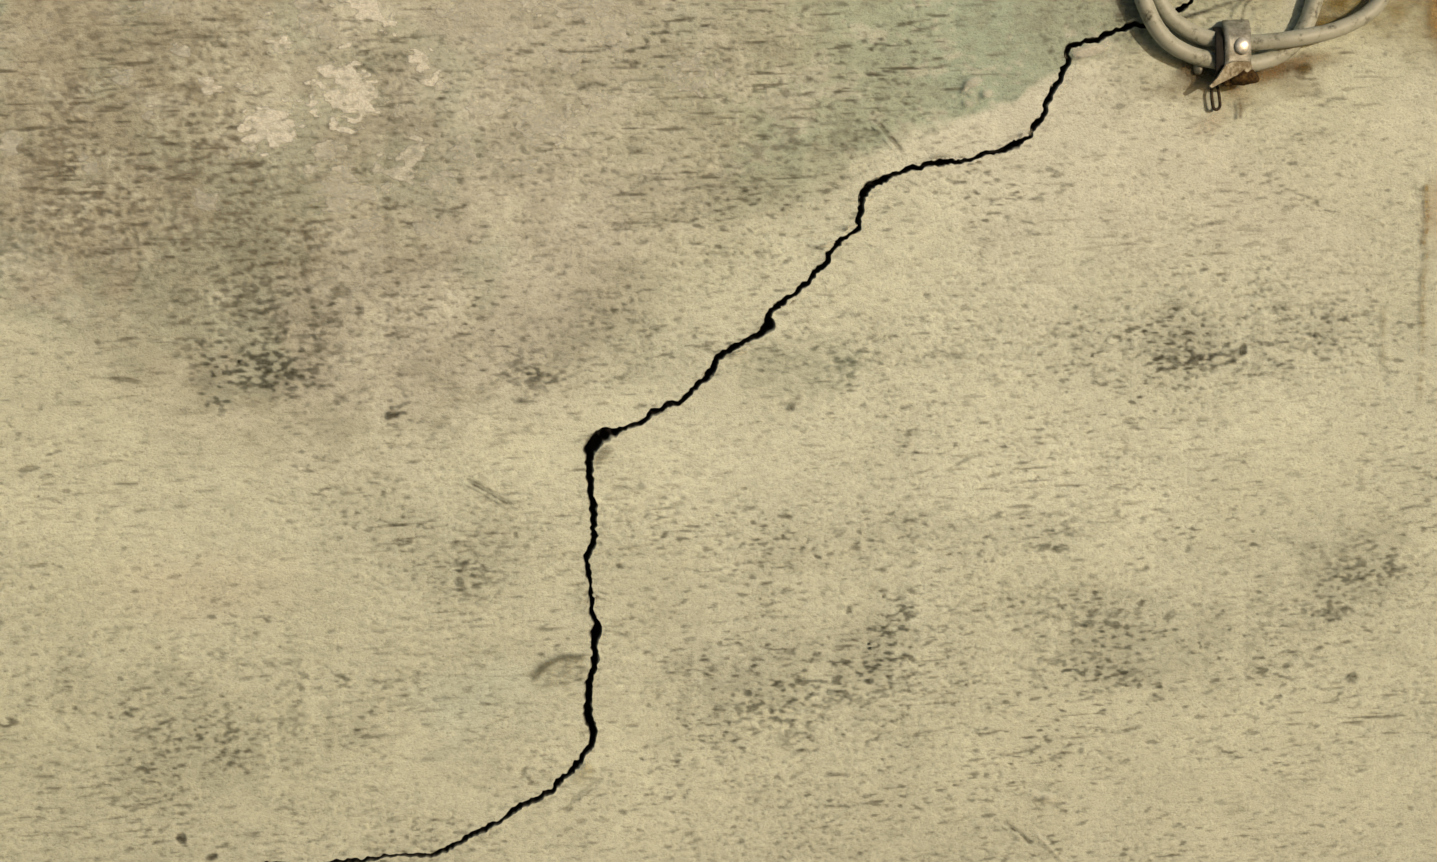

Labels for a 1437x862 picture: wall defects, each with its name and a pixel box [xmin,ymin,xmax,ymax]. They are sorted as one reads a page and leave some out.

crack [329,0,1251,862]
rust [1314,0,1367,27]